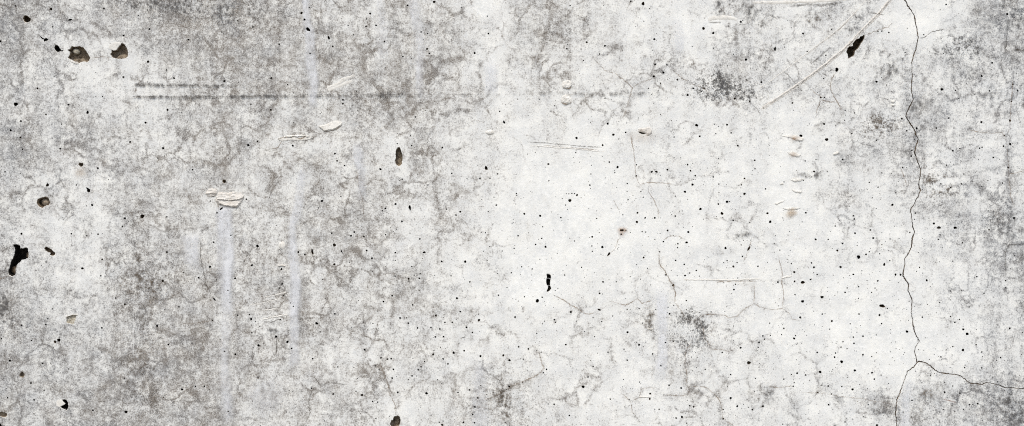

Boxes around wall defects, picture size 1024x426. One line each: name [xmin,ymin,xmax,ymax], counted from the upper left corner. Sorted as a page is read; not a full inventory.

spalling [846,35,865,59]
flaking render [277,121,342,148]
flaking render [205,188,244,208]
crack [895,0,1024,426]
spalling [8,244,29,277]